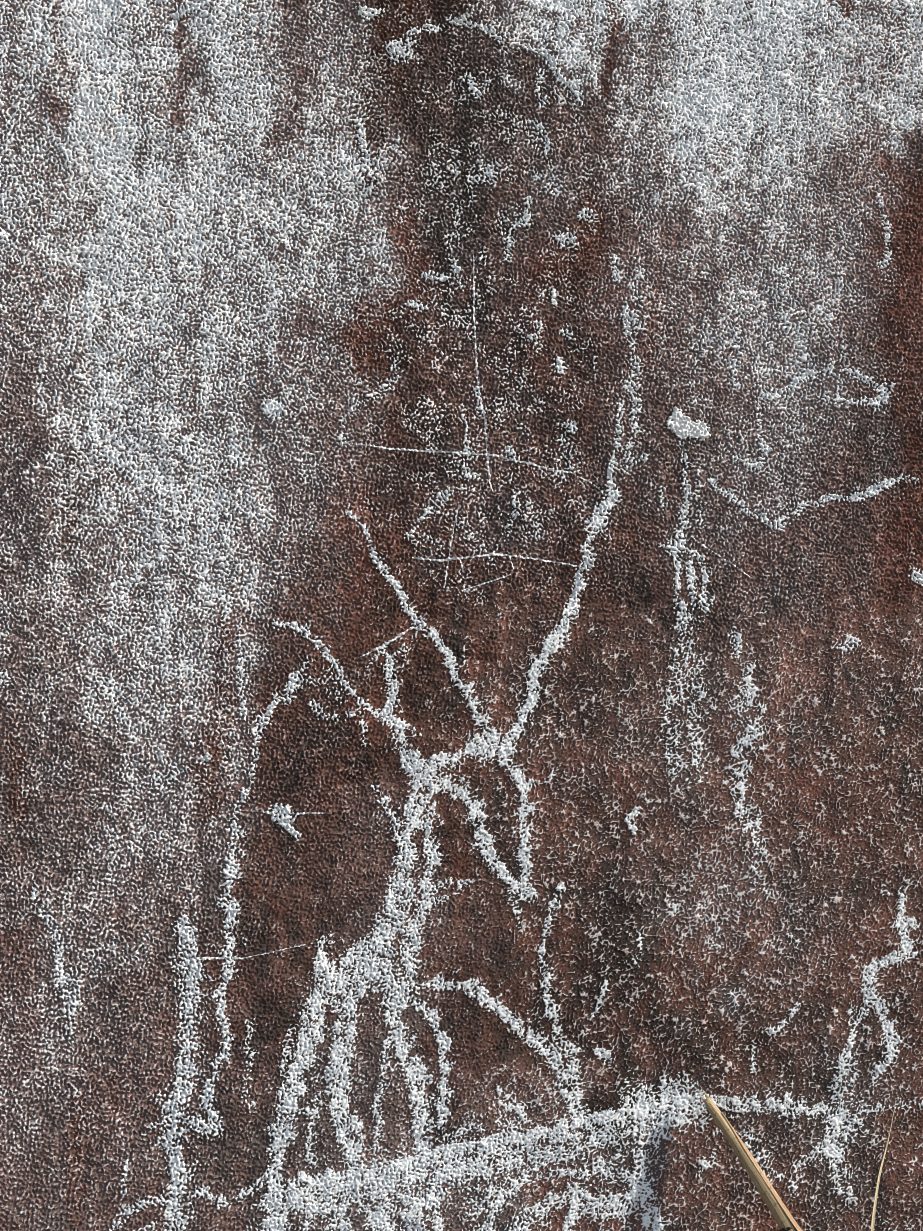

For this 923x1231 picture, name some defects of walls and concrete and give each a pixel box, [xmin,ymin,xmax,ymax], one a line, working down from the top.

efflorescence [0,0,82,274]
efflorescence [403,11,508,50]
efflorescence [457,0,923,271]
efflorescence [66,0,393,735]
damp [109,250,923,1231]